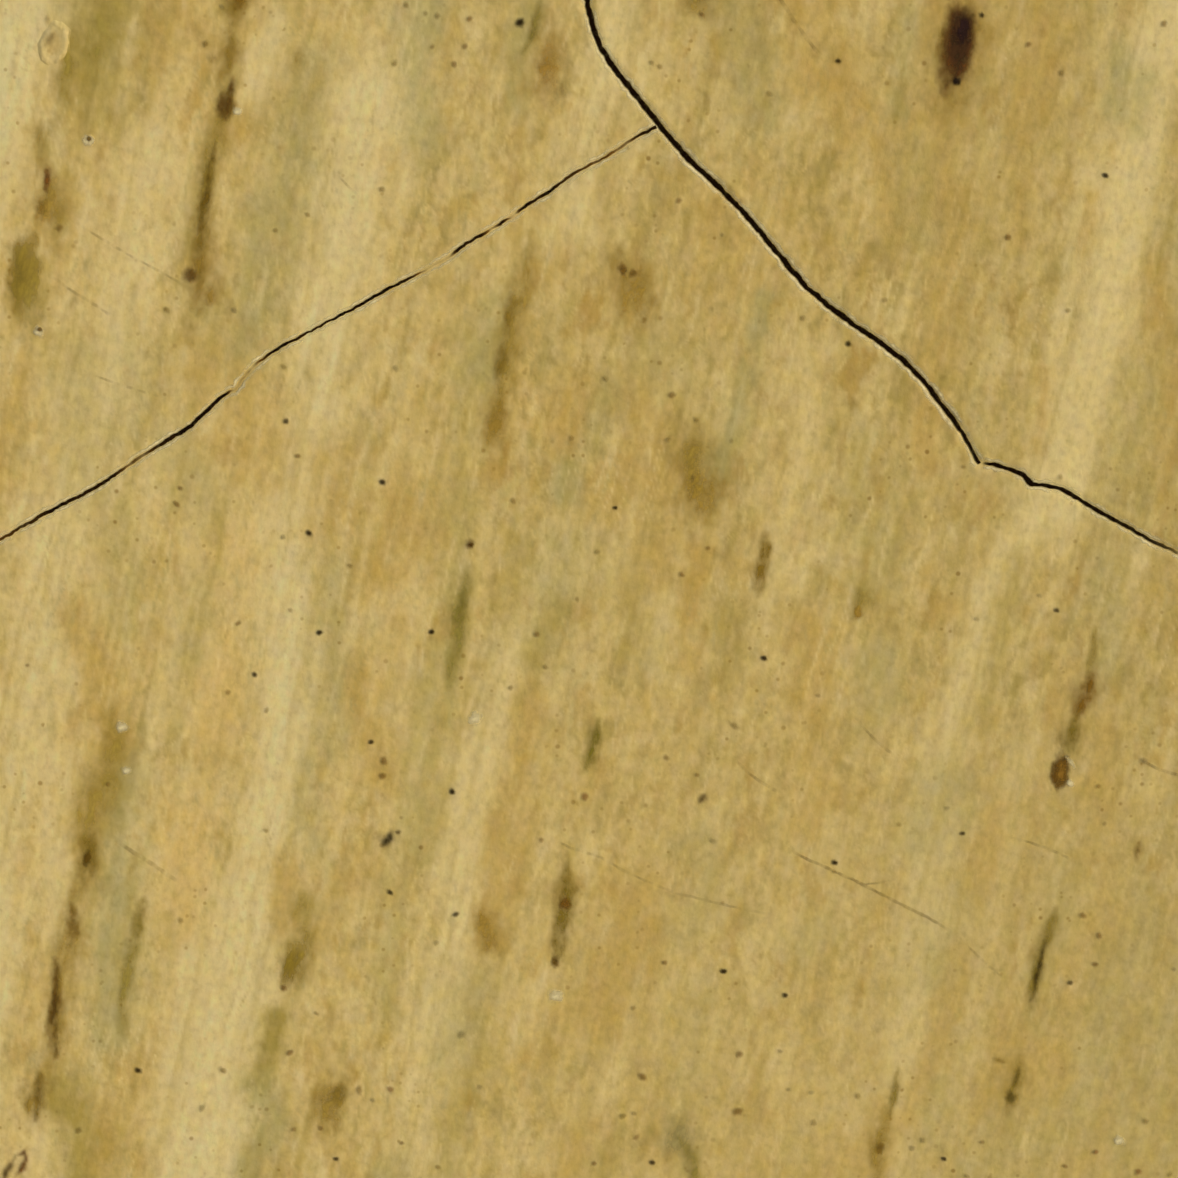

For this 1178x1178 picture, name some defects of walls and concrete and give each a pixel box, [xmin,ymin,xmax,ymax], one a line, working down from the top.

crack [0,0,1178,558]